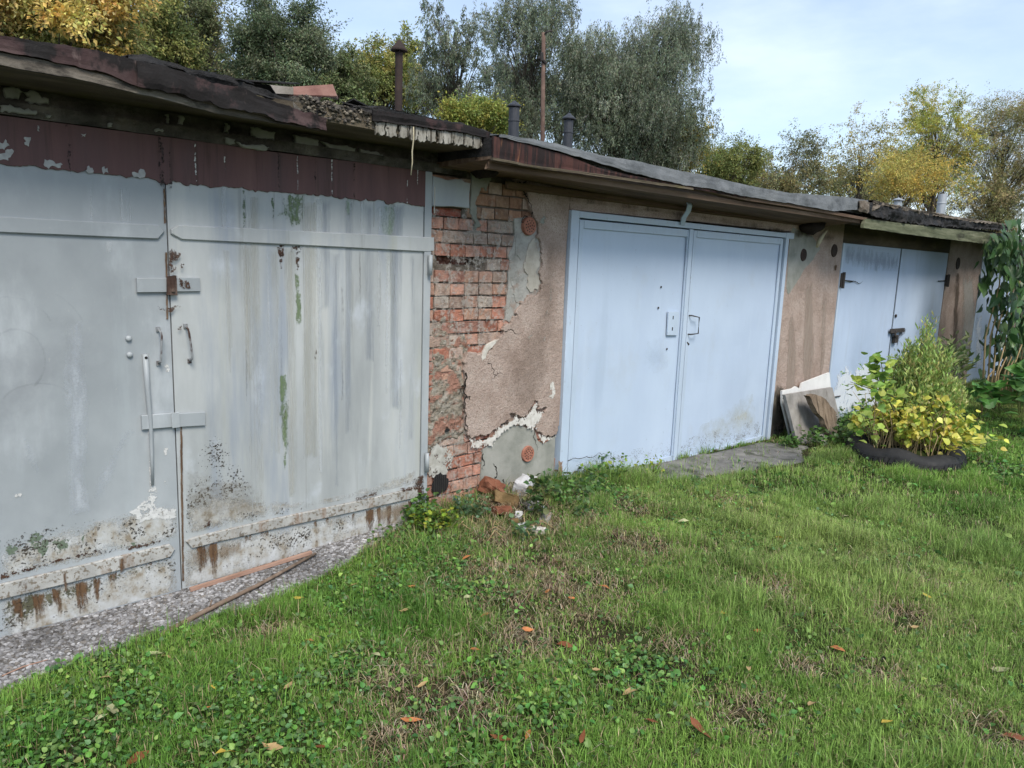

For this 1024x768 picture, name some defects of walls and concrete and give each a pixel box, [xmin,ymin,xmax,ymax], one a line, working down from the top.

spalling [0,87,52,160]
peeling [286,94,482,149]
corrosion [165,249,190,289]
peeling [503,217,541,322]
peeling [481,340,497,361]
damp [280,375,289,466]
crack [460,363,499,432]
damp [2,432,302,575]
corrosion [352,475,424,528]
corrosion [1,540,160,618]
damp [0,501,413,634]
corrosion [197,532,269,570]